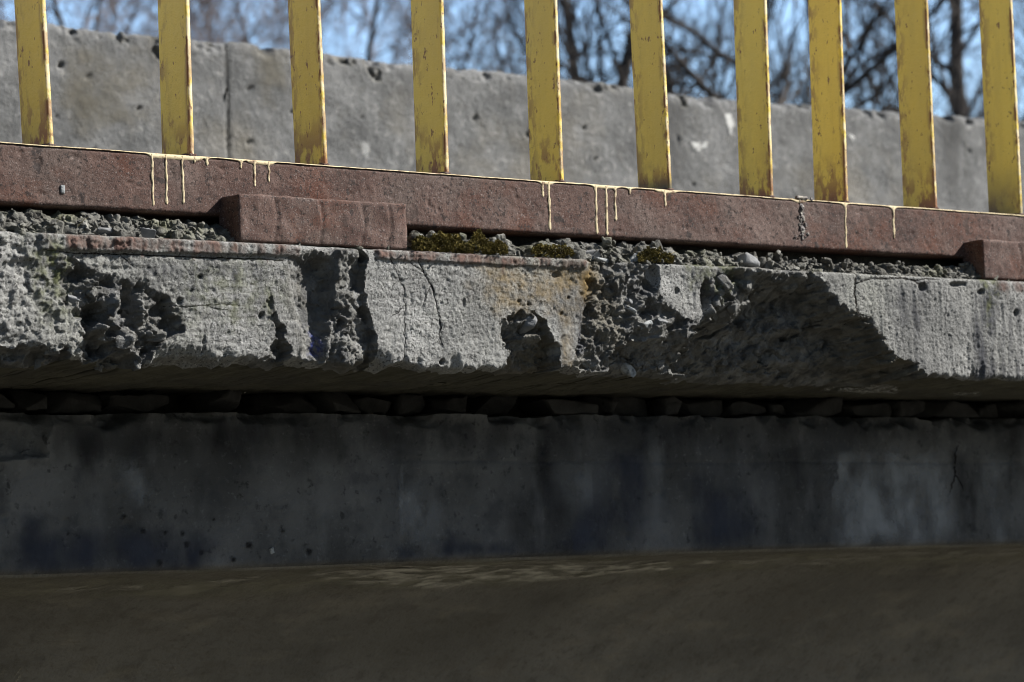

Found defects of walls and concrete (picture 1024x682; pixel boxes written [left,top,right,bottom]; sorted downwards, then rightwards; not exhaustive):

spalling [0,253,186,372]
spalling [247,248,378,374]
crack [390,259,444,359]
spalling [489,256,946,388]
water stain [831,455,947,541]